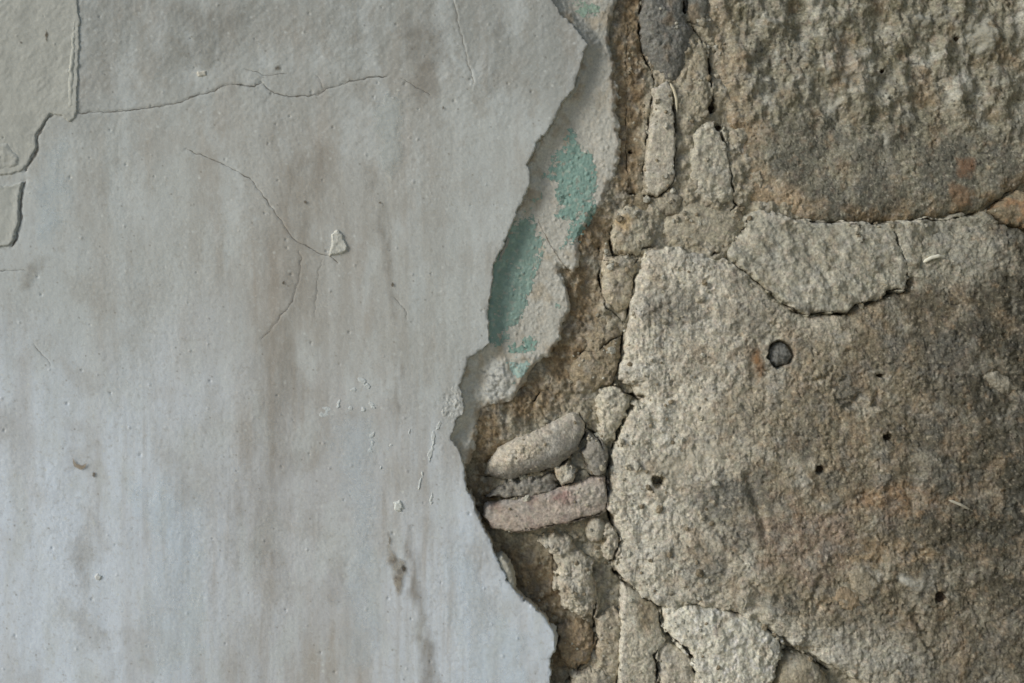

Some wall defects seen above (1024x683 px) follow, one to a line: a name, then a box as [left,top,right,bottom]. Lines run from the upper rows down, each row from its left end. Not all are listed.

spalling [451,0,621,465]
crack [712,136,1010,316]
spalling [982,371,1018,394]
spalling [496,551,517,588]
spalling [832,567,882,611]